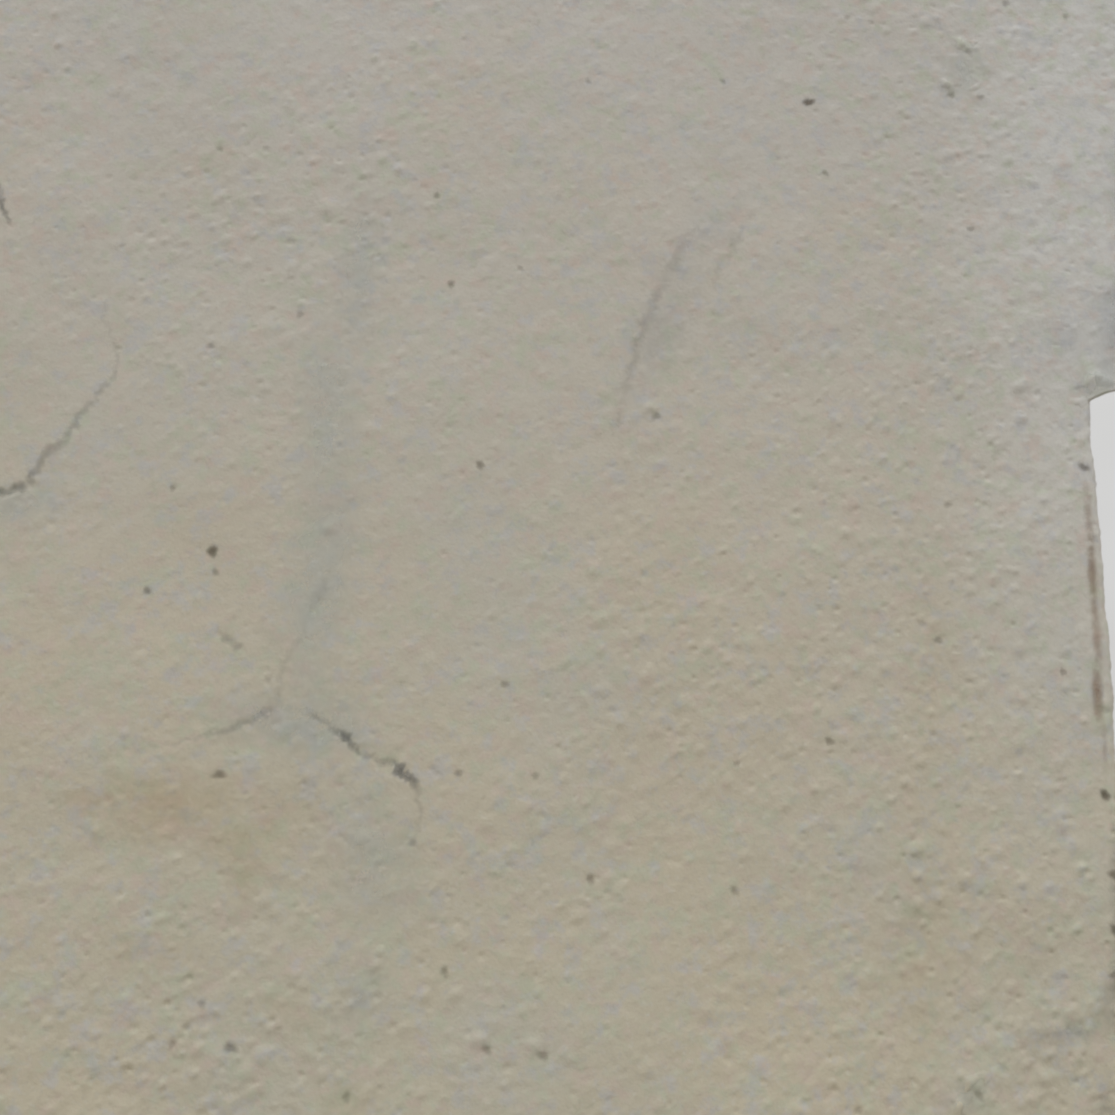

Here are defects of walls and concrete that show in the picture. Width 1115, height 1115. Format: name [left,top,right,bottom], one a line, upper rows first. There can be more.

crack [397,766,414,782]